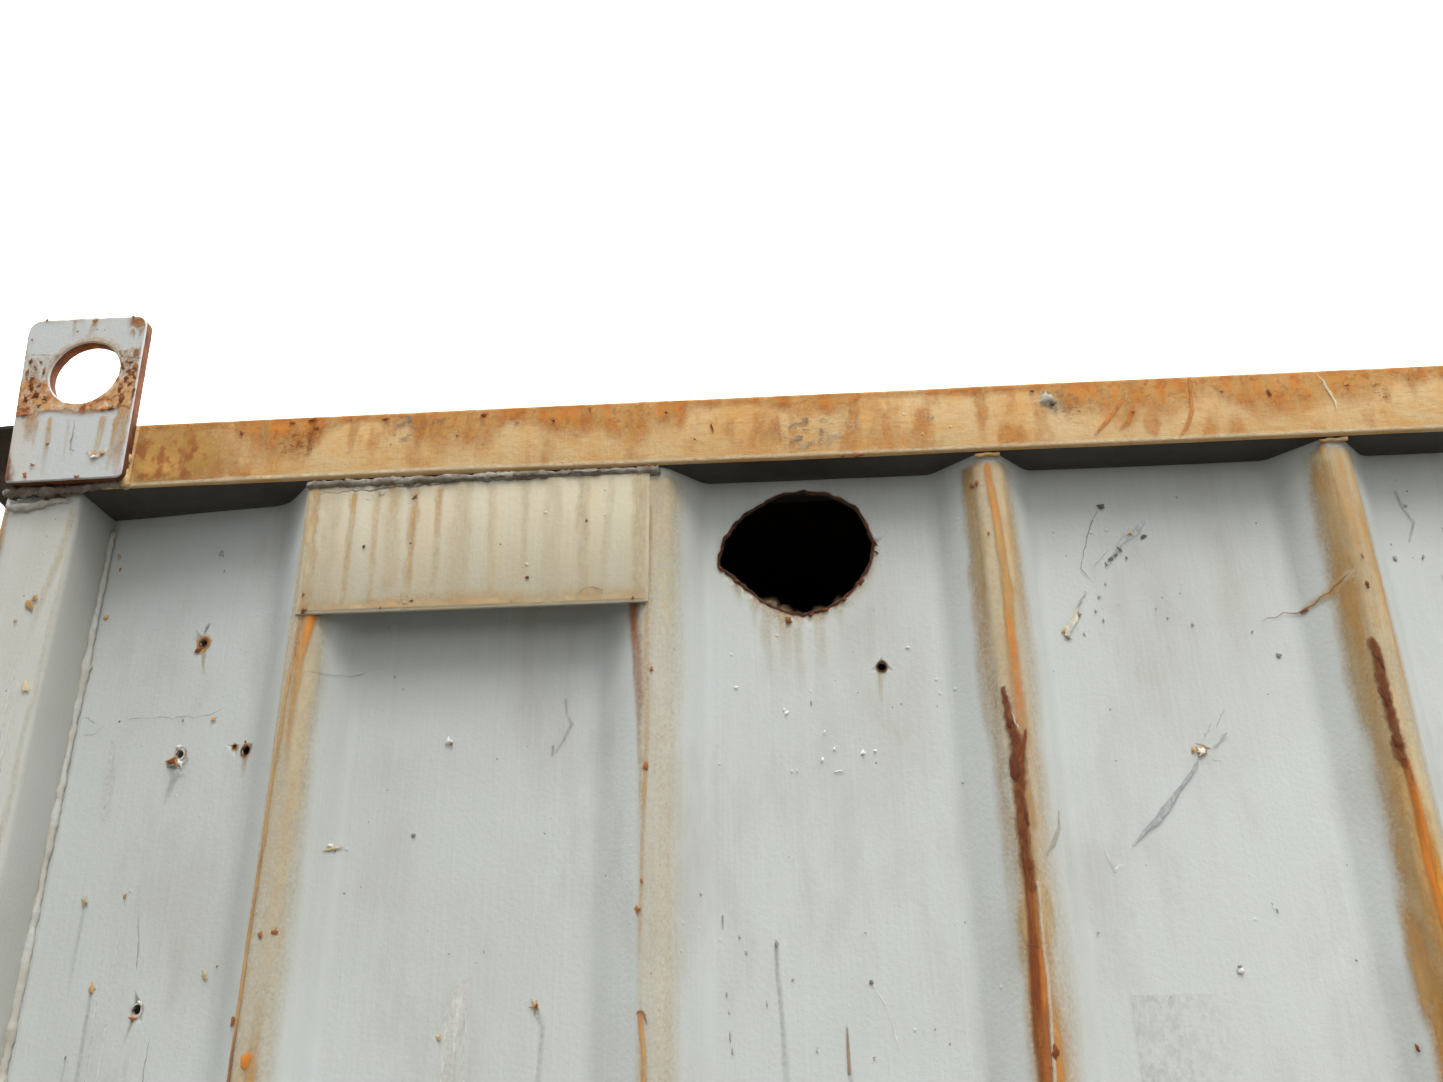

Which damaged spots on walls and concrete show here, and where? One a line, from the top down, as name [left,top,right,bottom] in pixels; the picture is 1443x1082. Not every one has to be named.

corrosion [194,636,211,663]
corrosion [227,464,677,1082]
corrosion [16,314,1443,481]
corrosion [963,463,1070,1082]
corrosion [1310,444,1443,1078]